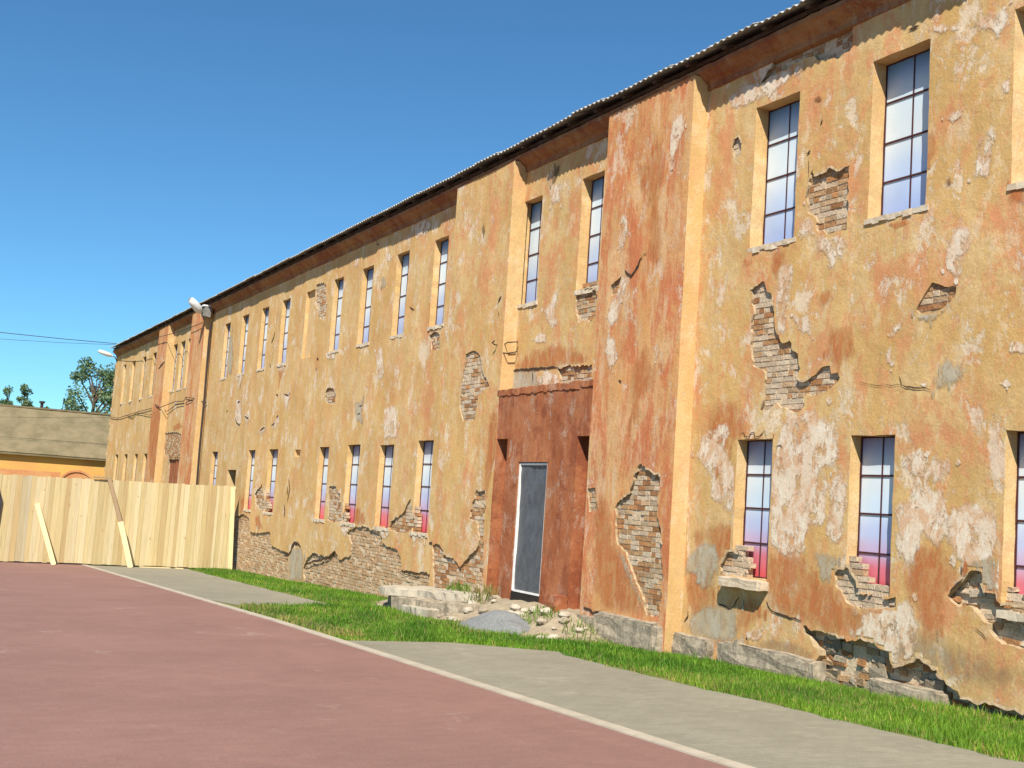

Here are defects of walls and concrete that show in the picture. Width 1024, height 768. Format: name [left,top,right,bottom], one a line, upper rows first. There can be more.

spalling [798,165,849,268]
spalling [317,282,327,320]
spalling [461,351,489,421]
spalling [538,364,592,385]
spalling [577,278,626,373]
peeling [750,264,847,556]
spalling [918,227,971,314]
spalling [303,484,489,598]
spalling [617,465,663,617]
spalling [721,545,756,578]
peeling [894,448,1024,648]
spalling [808,556,1024,720]